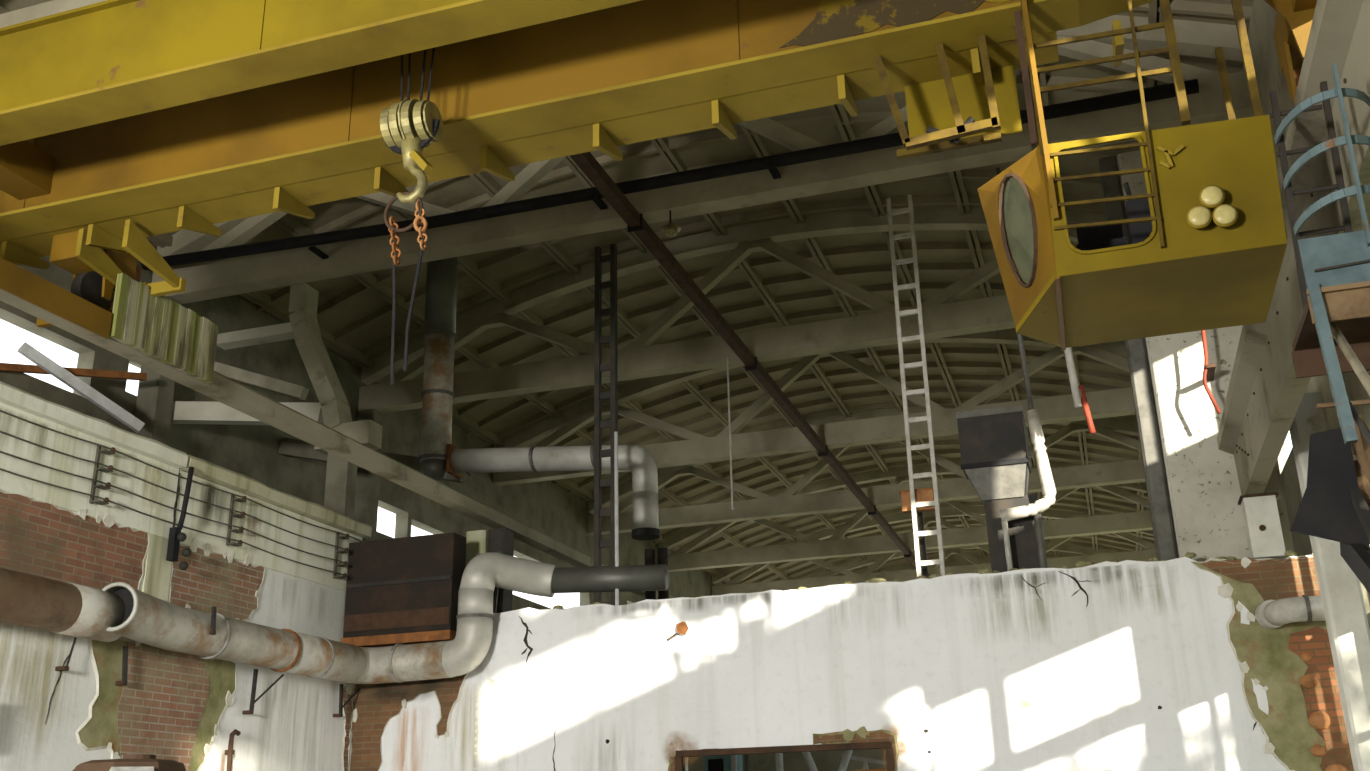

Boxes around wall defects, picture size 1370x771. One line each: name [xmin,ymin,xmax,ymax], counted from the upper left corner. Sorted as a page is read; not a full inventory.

flaking render [0,489,149,590]
flaking render [168,537,265,621]
crack [519,616,533,663]
crack [1020,571,1092,607]
flaking render [1190,553,1354,771]
flaking render [341,670,473,771]